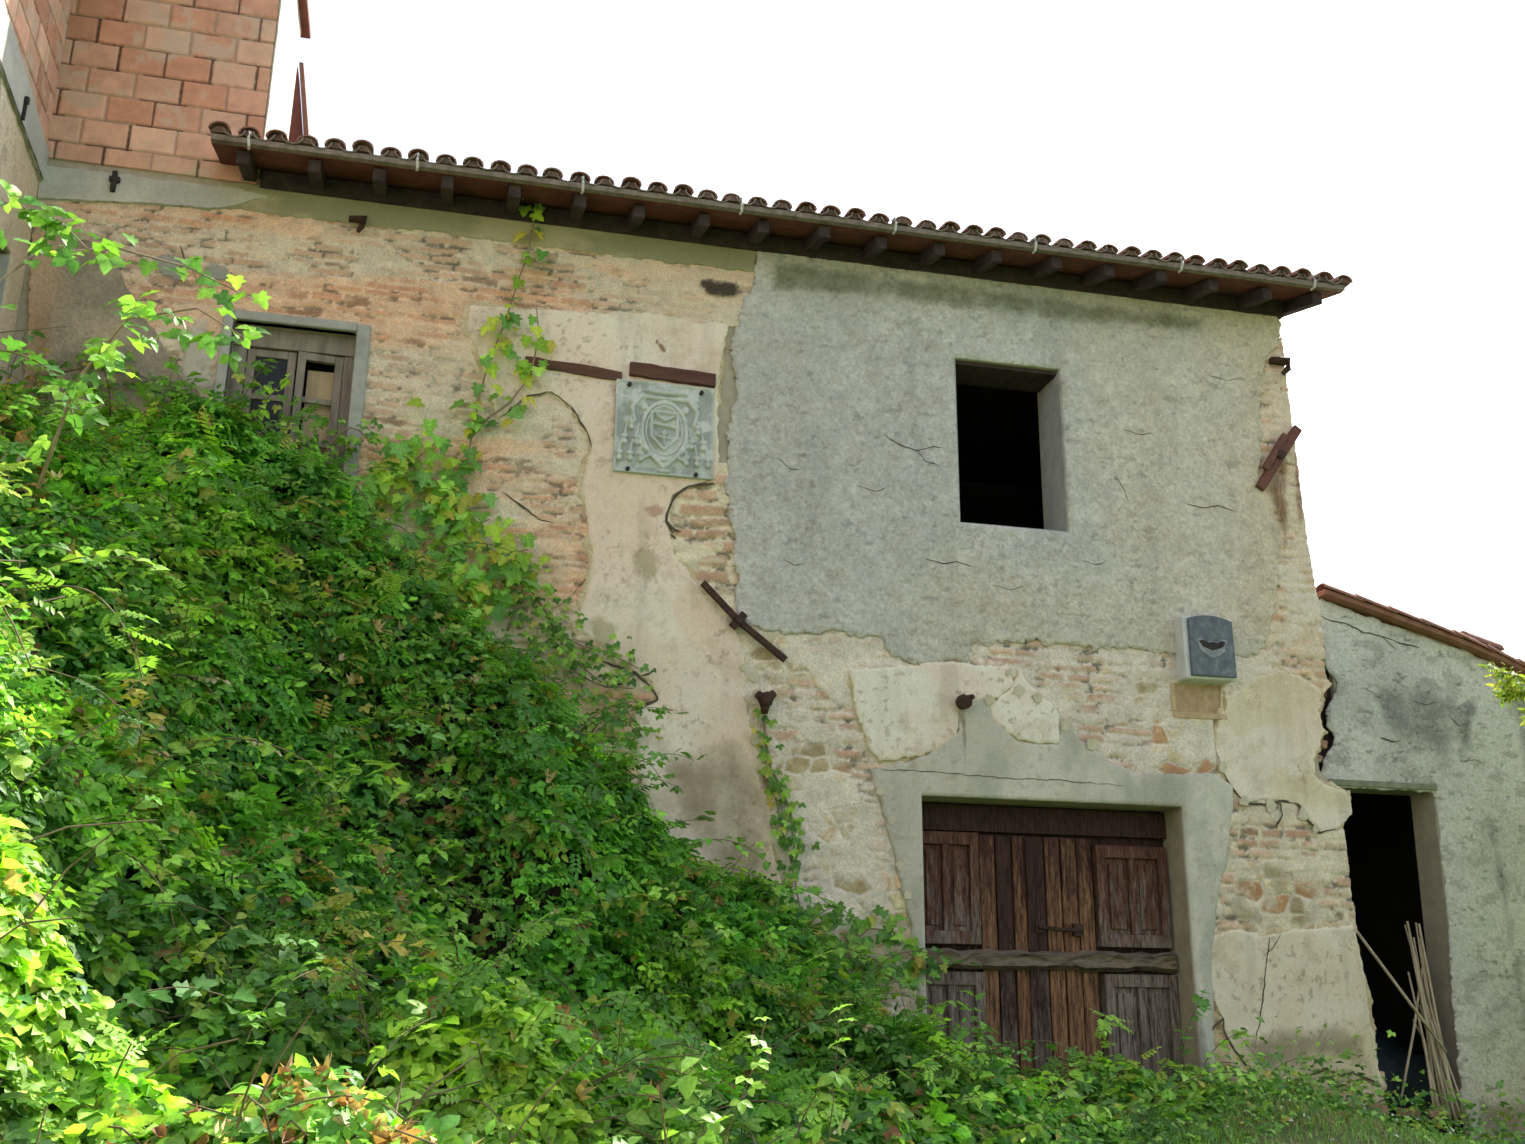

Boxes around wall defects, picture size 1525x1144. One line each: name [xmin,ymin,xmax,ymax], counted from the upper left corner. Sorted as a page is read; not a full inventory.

flaking render [35,198,755,813]
flaking render [946,338,1332,777]
crack [1321,616,1420,649]
flaking render [669,462,927,1025]
crack [1217,755,1335,834]
flaking render [1214,792,1357,936]
crack [1318,660,1375,772]
crack [1212,936,1280,1069]